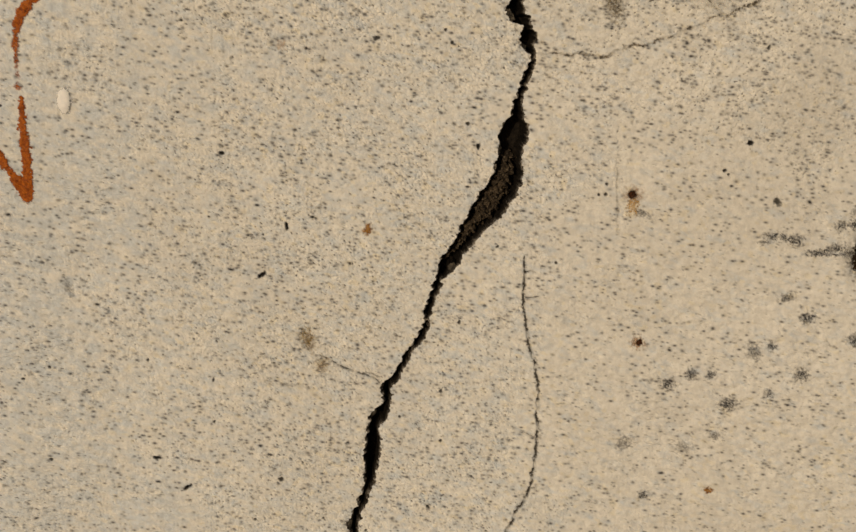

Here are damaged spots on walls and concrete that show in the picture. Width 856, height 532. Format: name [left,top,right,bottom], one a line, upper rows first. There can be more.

crack [333,0,609,532]
crack [629,0,758,48]